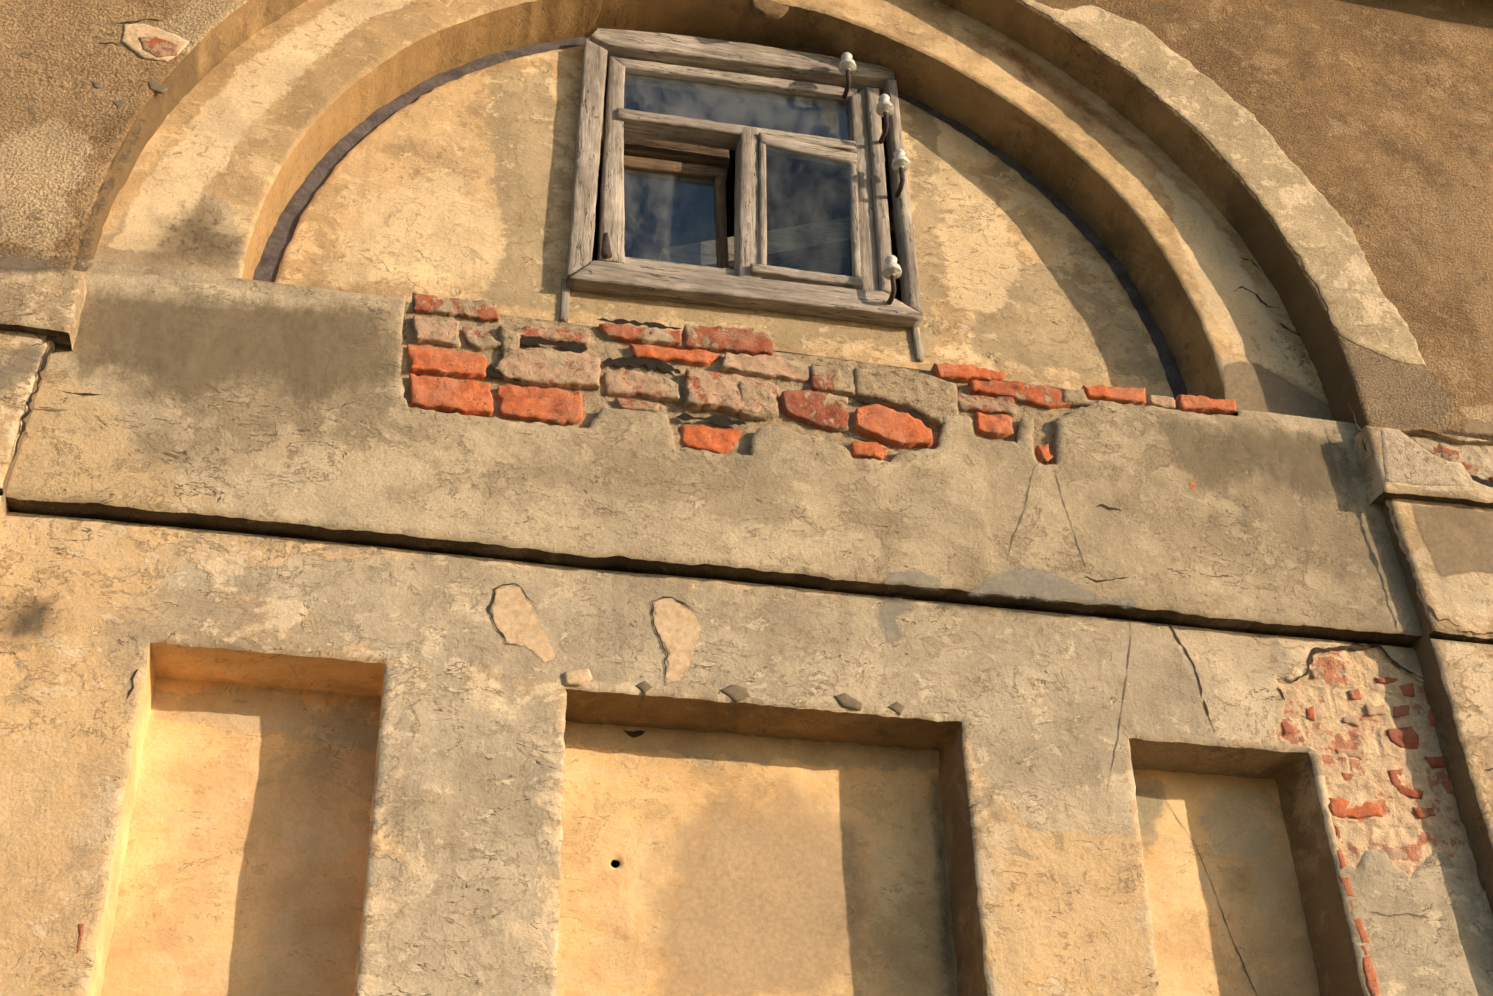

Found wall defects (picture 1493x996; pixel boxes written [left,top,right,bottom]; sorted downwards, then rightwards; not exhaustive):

spalling [121,23,189,62]
spalling [400,292,1237,465]
spalling [1400,429,1493,488]
flaking render [488,583,592,686]
flaking render [636,596,702,708]
crack [1107,618,1215,791]
crack [1159,788,1258,996]
flaking render [1275,642,1483,996]